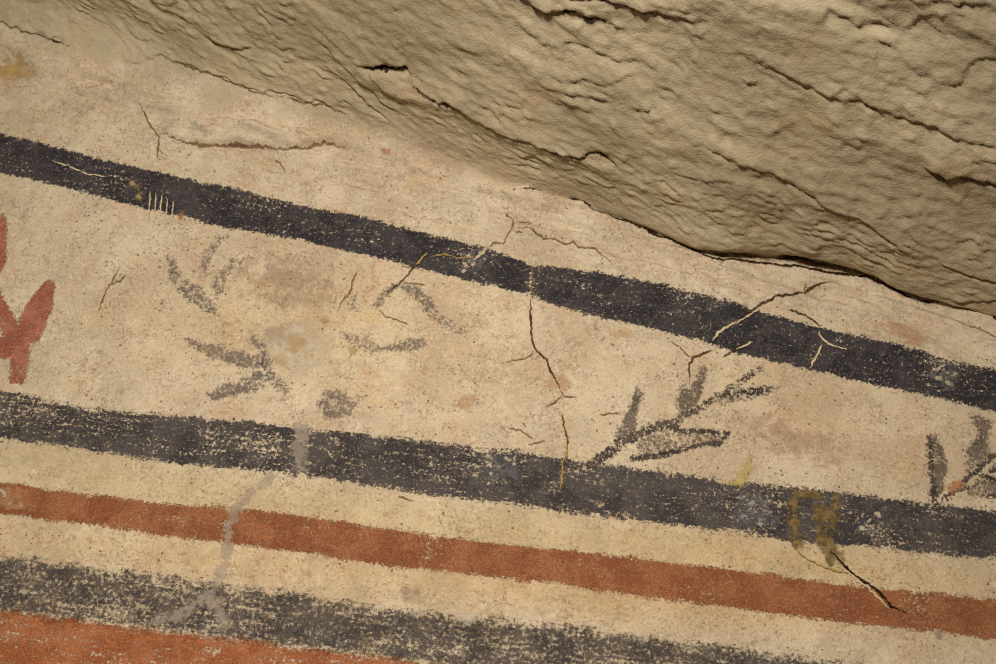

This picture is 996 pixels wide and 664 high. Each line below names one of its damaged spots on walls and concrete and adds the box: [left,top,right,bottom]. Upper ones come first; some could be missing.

crack [379,213,612,323]
crack [502,267,575,490]
crack [514,187,940,382]
crack [794,547,906,613]